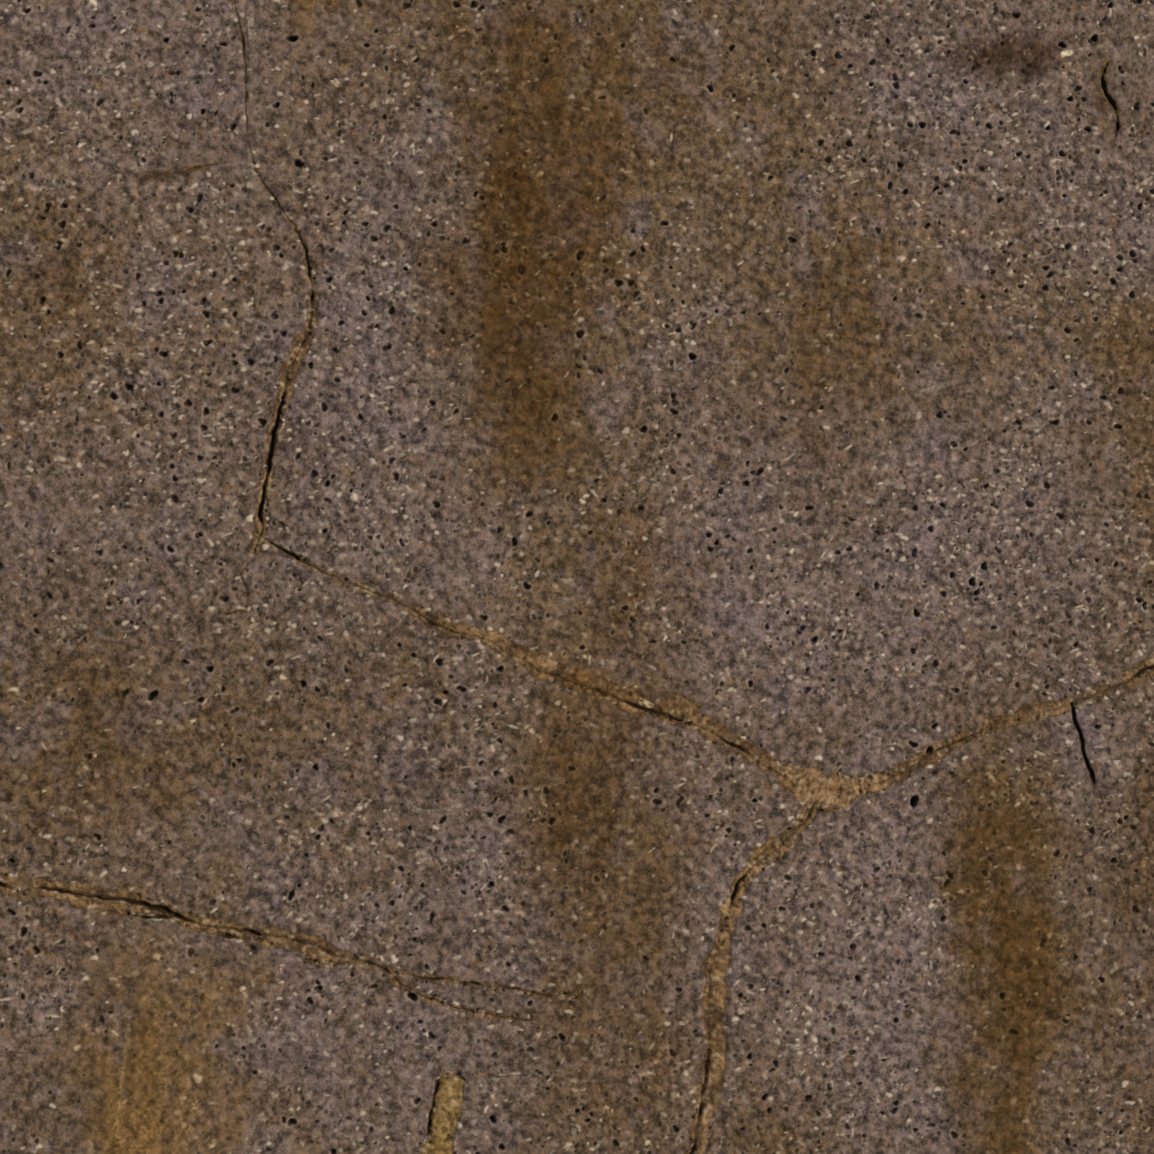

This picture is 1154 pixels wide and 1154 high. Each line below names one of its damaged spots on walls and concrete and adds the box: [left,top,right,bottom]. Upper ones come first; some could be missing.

crack [226,567,249,615]
crack [234,0,1154,1154]
crack [0,875,582,1021]